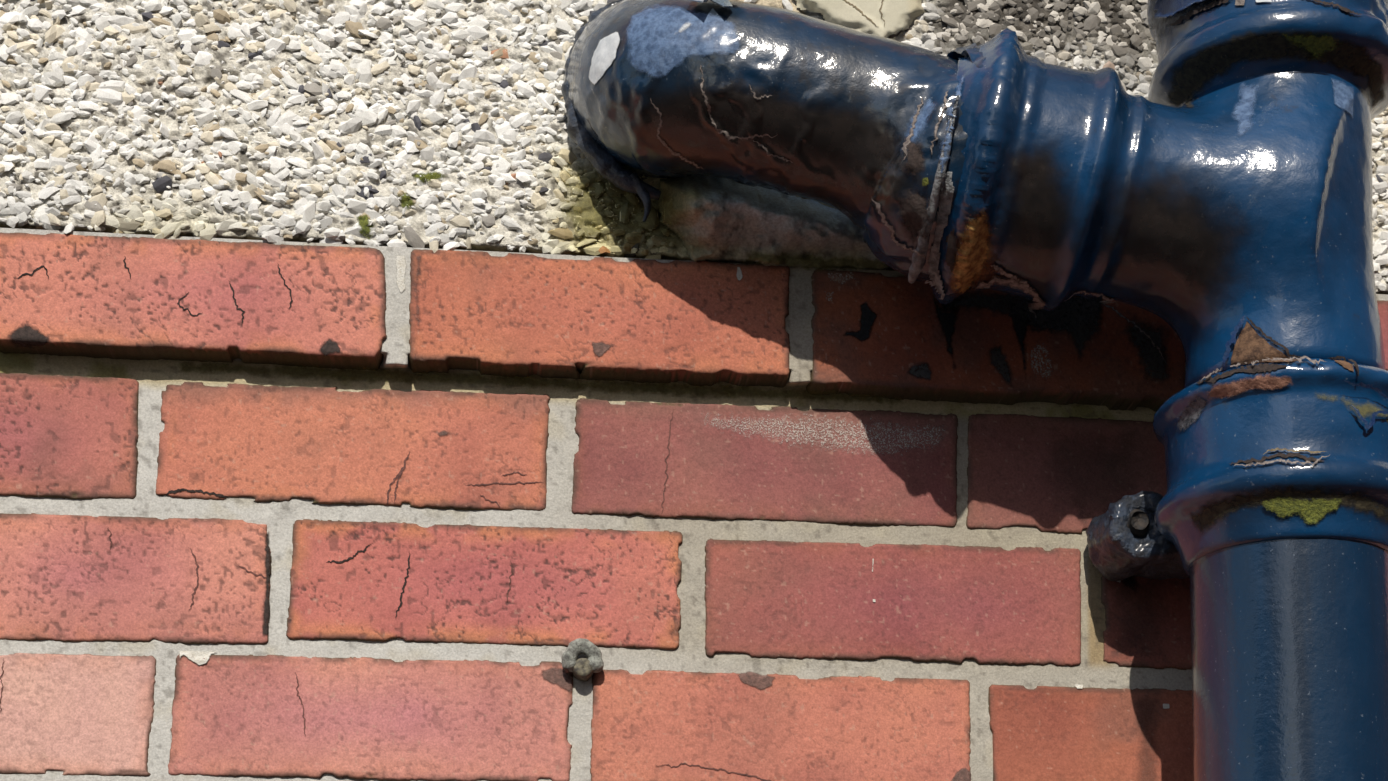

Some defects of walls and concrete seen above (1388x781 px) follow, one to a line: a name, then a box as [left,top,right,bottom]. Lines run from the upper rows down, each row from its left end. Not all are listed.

crack [845,0,912,39]
water stain [706,415,945,455]
crack [386,452,410,505]
crack [326,544,371,563]
crack [395,553,410,618]